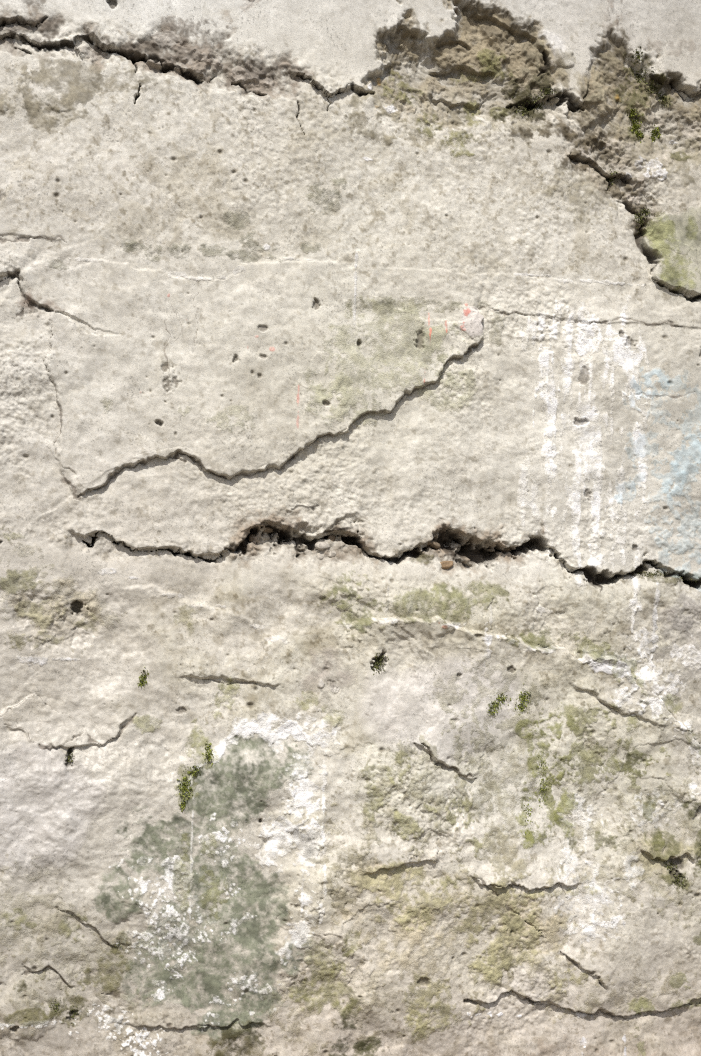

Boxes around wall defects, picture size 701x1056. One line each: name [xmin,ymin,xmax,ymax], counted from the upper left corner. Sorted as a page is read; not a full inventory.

crack [0,16,267,105]
crack [296,74,376,135]
spalling [359,0,701,296]
crack [567,153,701,303]
crack [478,306,698,330]
crack [0,235,483,501]
crack [82,504,701,593]
water stain [108,708,344,1002]
crack [463,877,701,1020]
water stain [0,1003,169,1056]
water stain [200,970,278,1033]
water stain [467,1011,522,1019]